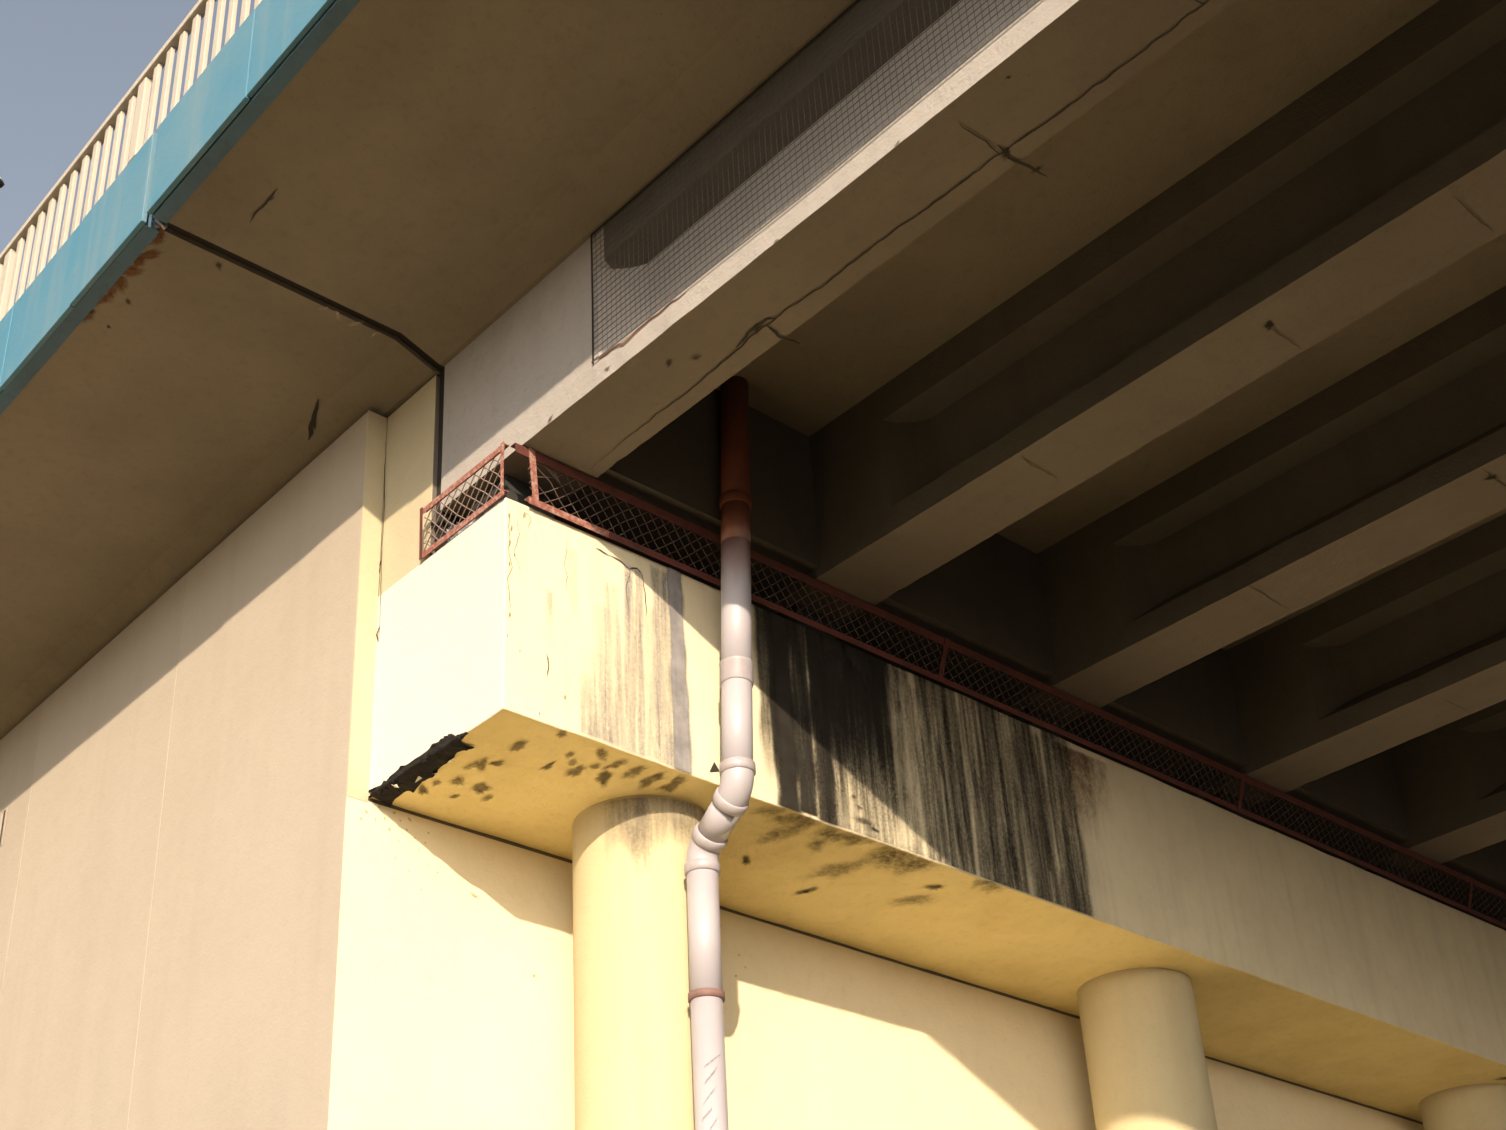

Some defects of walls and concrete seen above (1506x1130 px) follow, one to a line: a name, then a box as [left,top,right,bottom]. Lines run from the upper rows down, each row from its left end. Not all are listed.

crack [593,0,1209,467]
spalling [360,732,525,890]
peeling [542,750,684,792]
water stain [625,567,692,773]
water stain [754,605,1092,916]